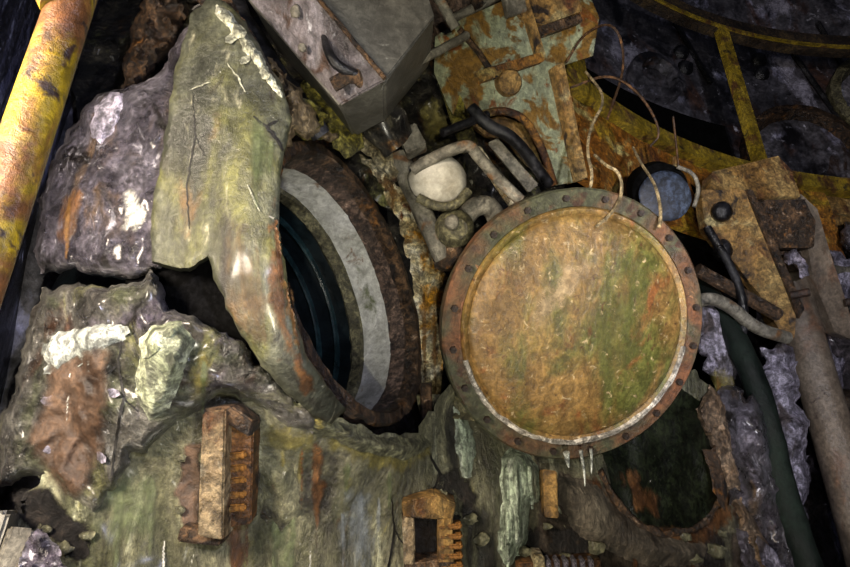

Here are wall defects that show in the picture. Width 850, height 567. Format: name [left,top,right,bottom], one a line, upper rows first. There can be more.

rust [227,427,260,567]
rust [299,445,326,526]